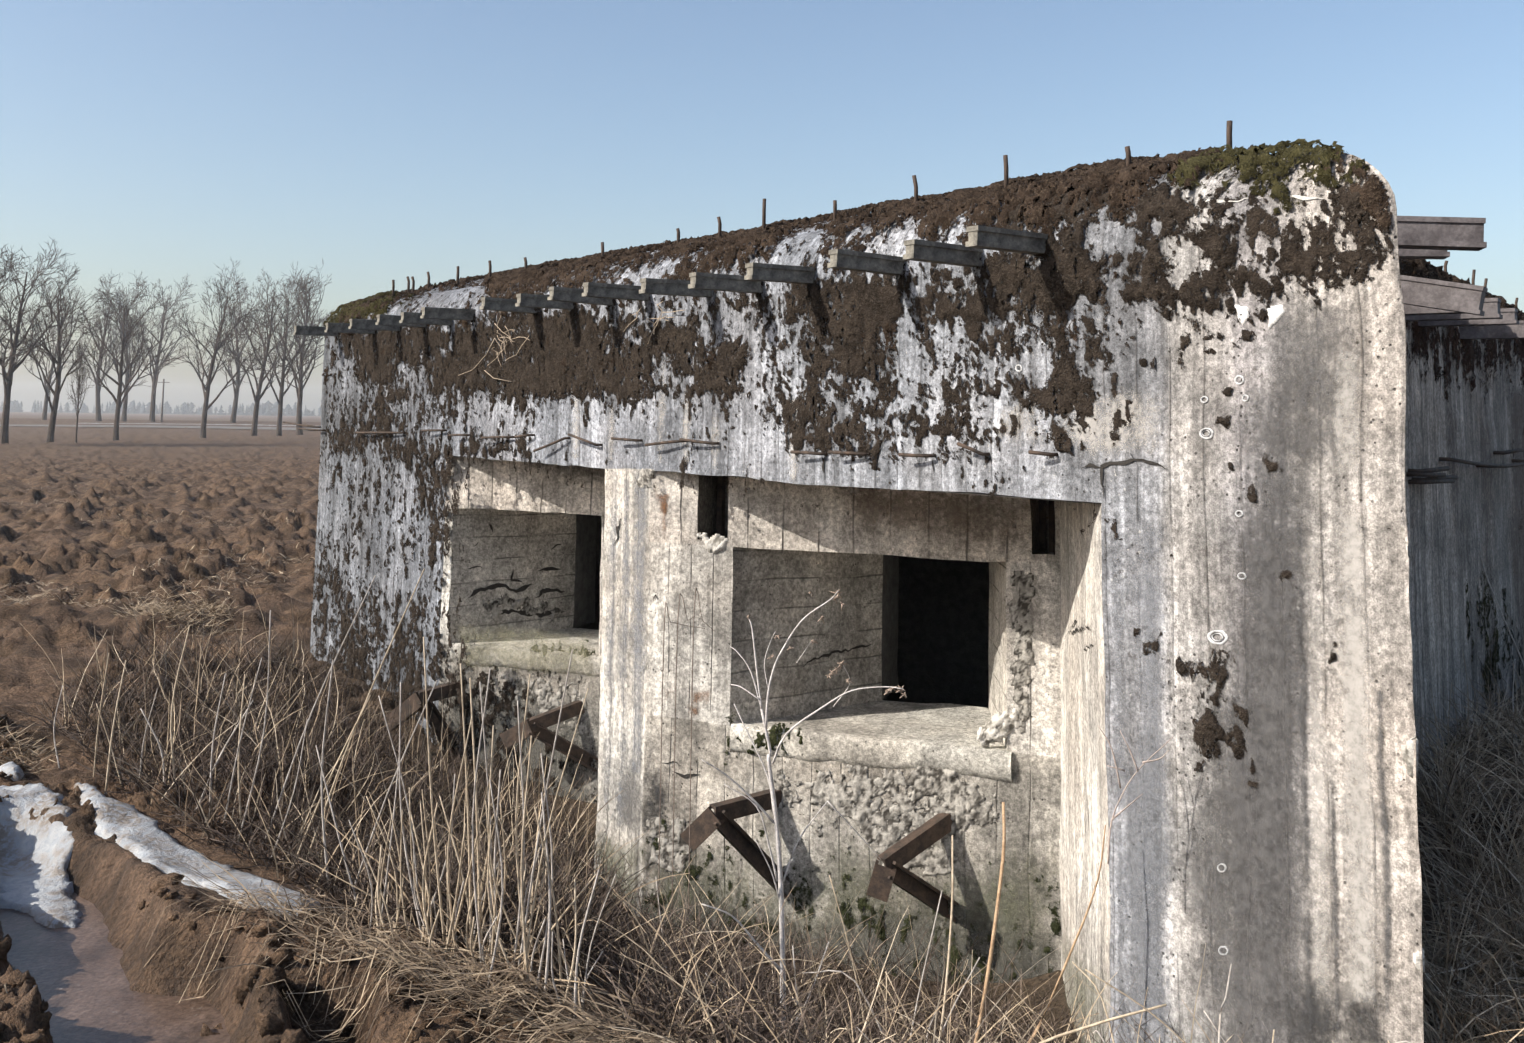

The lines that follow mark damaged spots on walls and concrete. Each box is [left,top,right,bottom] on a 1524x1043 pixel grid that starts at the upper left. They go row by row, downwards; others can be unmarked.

spalling [773,764,999,883]
water stain [1073,398,1154,448]
water stain [1116,531,1173,1043]
water stain [1189,315,1391,1043]